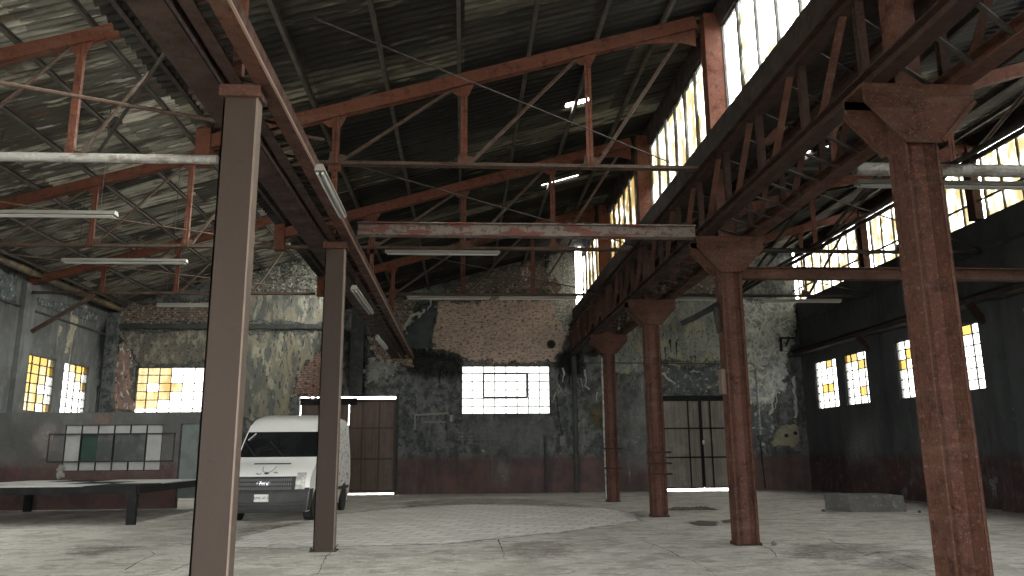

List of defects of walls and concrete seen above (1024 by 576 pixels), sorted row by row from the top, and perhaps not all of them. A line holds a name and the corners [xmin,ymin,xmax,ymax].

peeling [112,299,209,412]
peeling [243,259,323,422]
flaking render [363,251,579,399]
peeling [743,297,800,448]